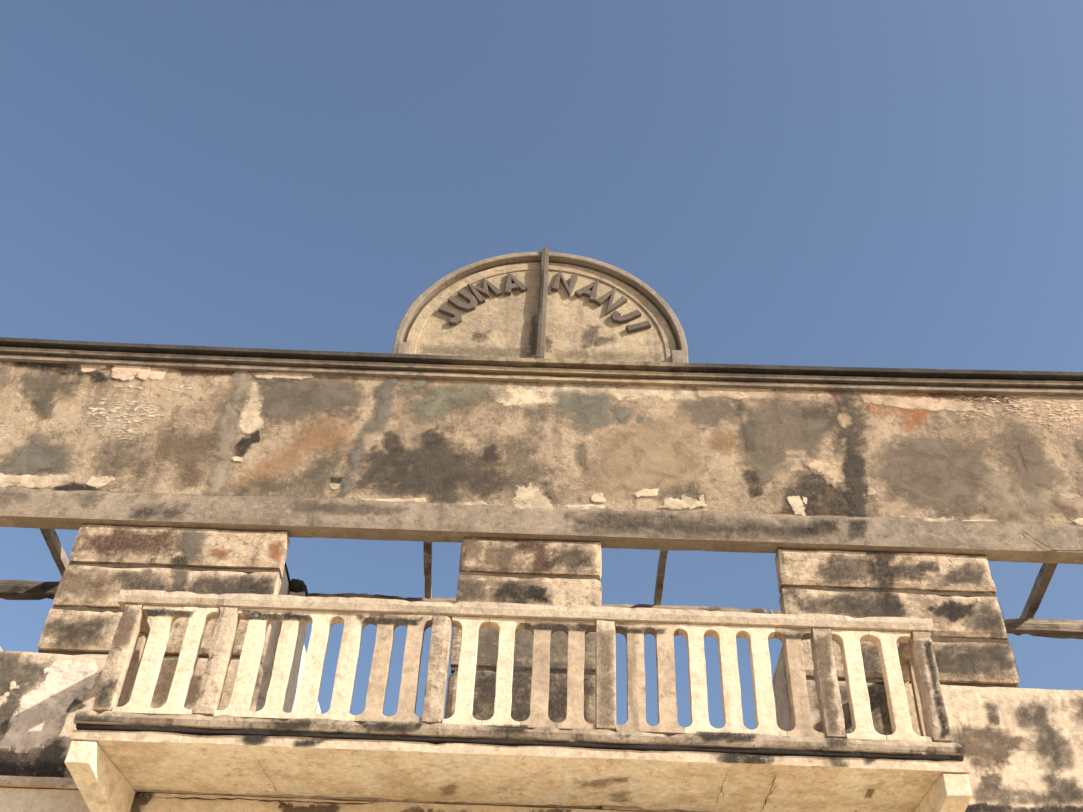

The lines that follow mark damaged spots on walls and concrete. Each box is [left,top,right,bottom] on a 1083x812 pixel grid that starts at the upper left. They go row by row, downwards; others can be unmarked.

flaking render [81,359,193,446]
leakage [235,376,550,514]
flaking render [633,489,707,510]
leakage [716,383,868,536]
flaking render [787,495,807,516]
corrosion [867,392,1013,431]
leakage [877,421,1063,514]
leakage [789,551,985,618]
leakage [0,651,46,734]
flaking render [0,660,99,754]
leakage [0,740,67,778]
leakage [965,703,1083,812]